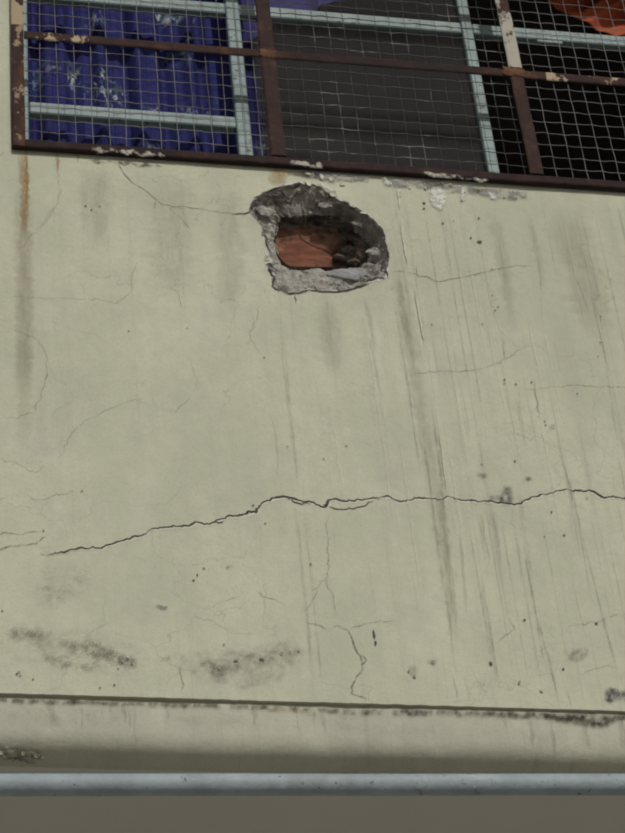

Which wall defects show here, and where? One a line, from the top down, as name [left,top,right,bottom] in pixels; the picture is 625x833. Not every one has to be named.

spalling [235,160,390,301]
crack [41,488,625,556]